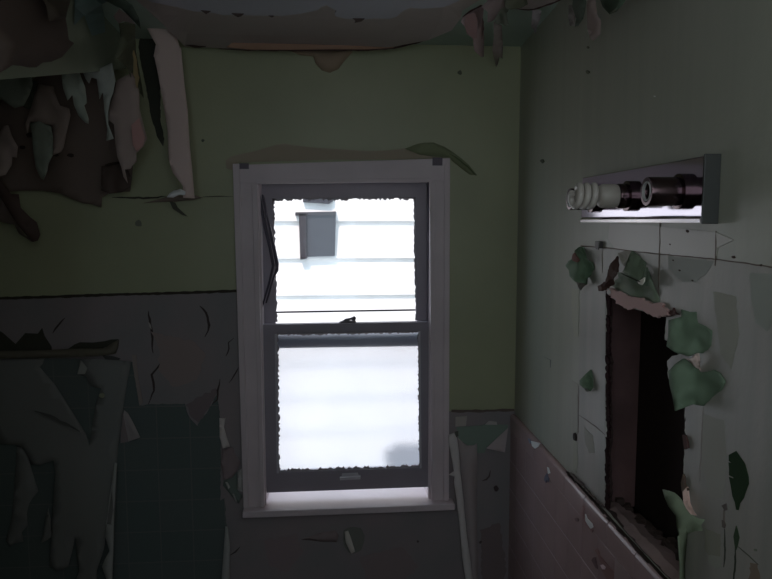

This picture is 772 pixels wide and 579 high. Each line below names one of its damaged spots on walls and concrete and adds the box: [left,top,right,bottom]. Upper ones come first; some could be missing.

peeling [0,0,74,72]
peeling [146,28,201,203]
crack [148,311,160,404]
peeling [577,247,772,579]